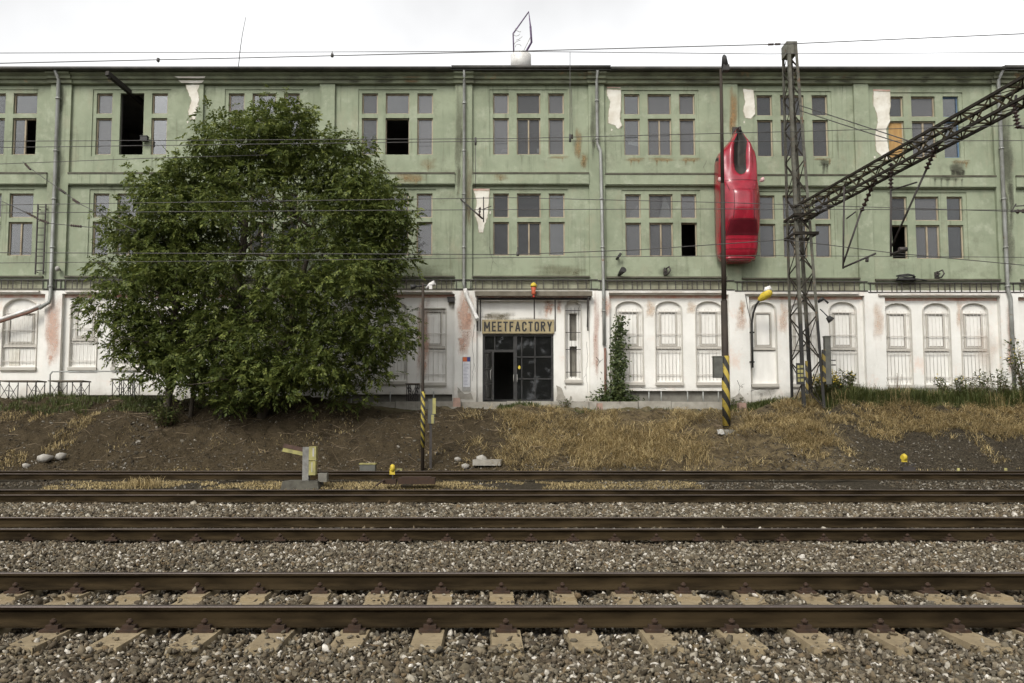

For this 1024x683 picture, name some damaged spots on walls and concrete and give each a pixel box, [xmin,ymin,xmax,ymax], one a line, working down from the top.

flaking render [175,76,205,123]
flaking render [606,87,622,131]
flaking render [743,88,756,123]
flaking render [872,89,891,160]
flaking render [473,189,491,233]